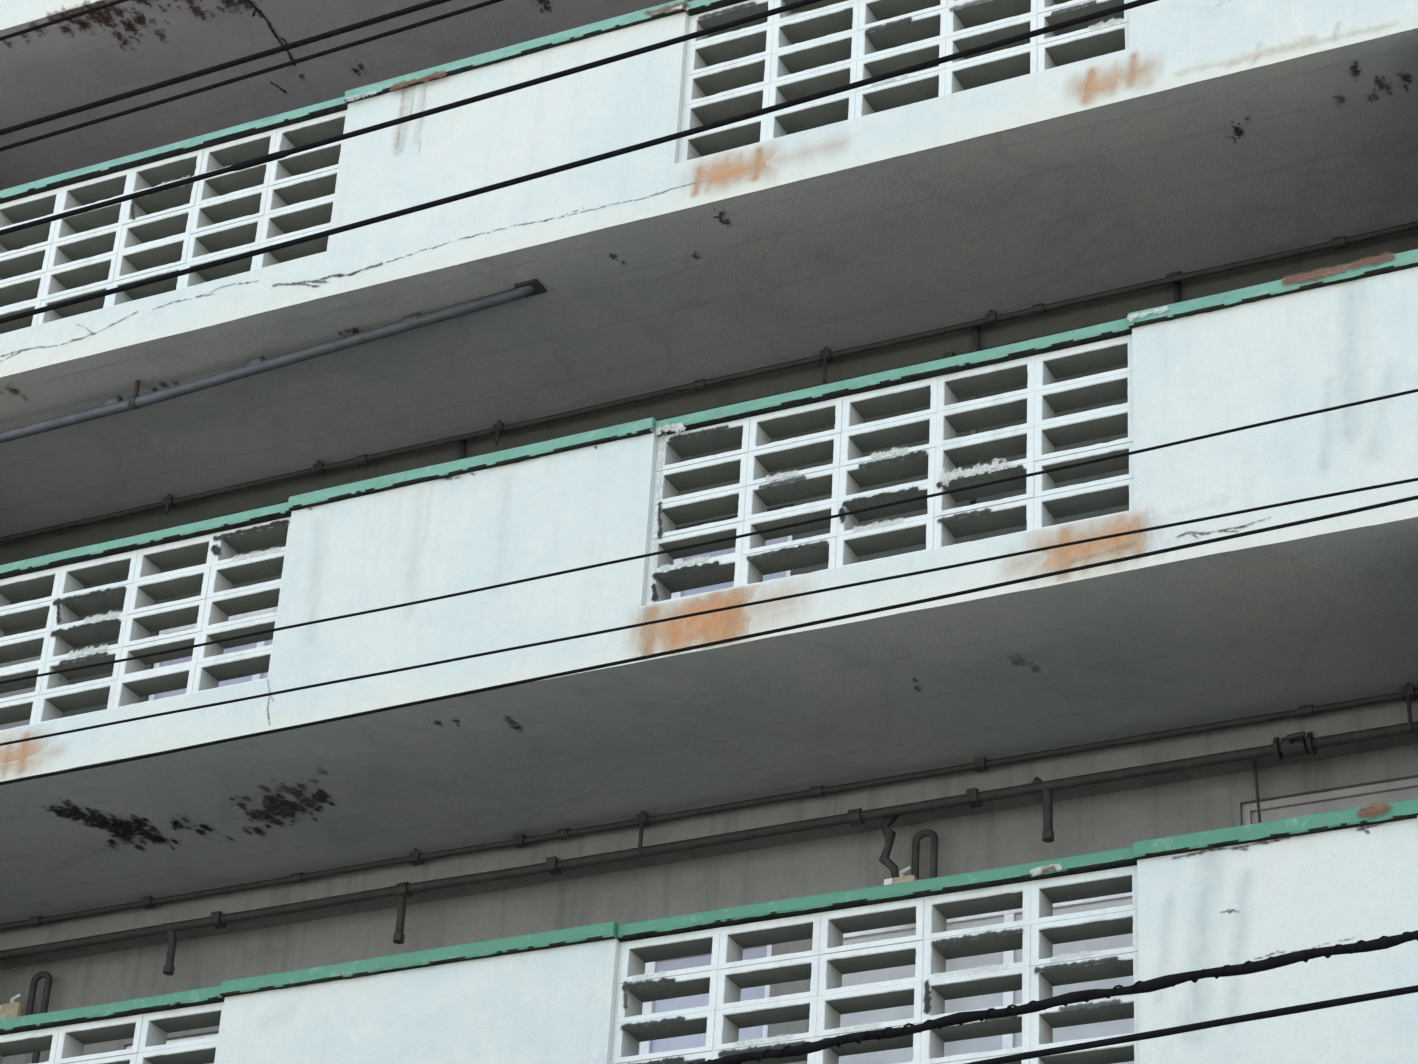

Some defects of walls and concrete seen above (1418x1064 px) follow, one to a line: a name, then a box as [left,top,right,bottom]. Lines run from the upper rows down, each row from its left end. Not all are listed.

peeling [60,0,260,49]
rust [693,148,772,195]
crack [0,181,702,362]
rust [1039,518,1141,575]
rust [641,588,752,656]
rust [0,734,37,771]
peeling [42,800,212,851]
peeling [229,780,334,835]